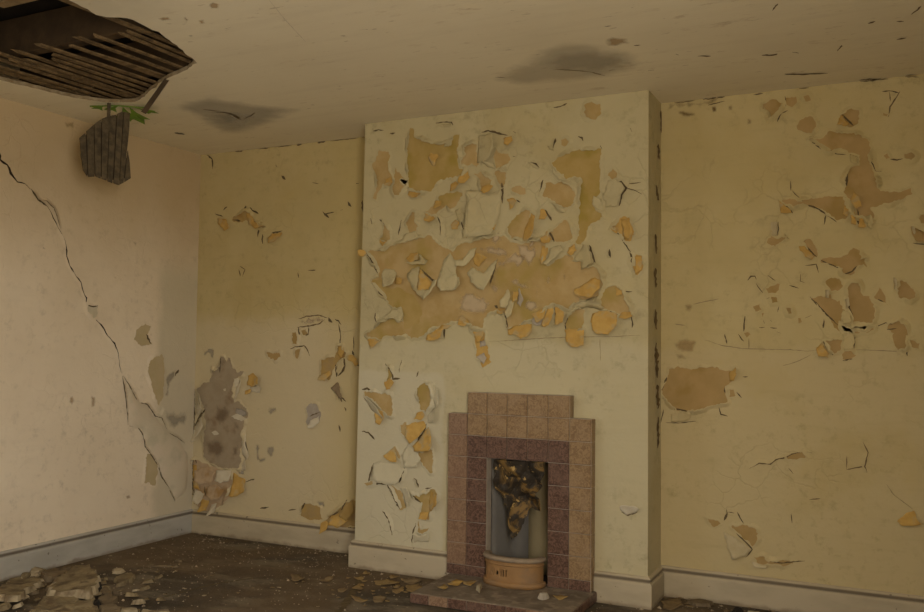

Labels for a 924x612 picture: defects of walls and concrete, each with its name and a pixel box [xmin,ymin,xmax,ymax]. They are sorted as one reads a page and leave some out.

crack [0,154,185,500]
spalling [190,353,261,516]
peeling [216,206,282,244]
peeling [288,497,356,534]
peeling [362,360,441,543]
peeling [265,121,657,411]
peeling [654,343,748,448]
peeling [741,91,924,363]